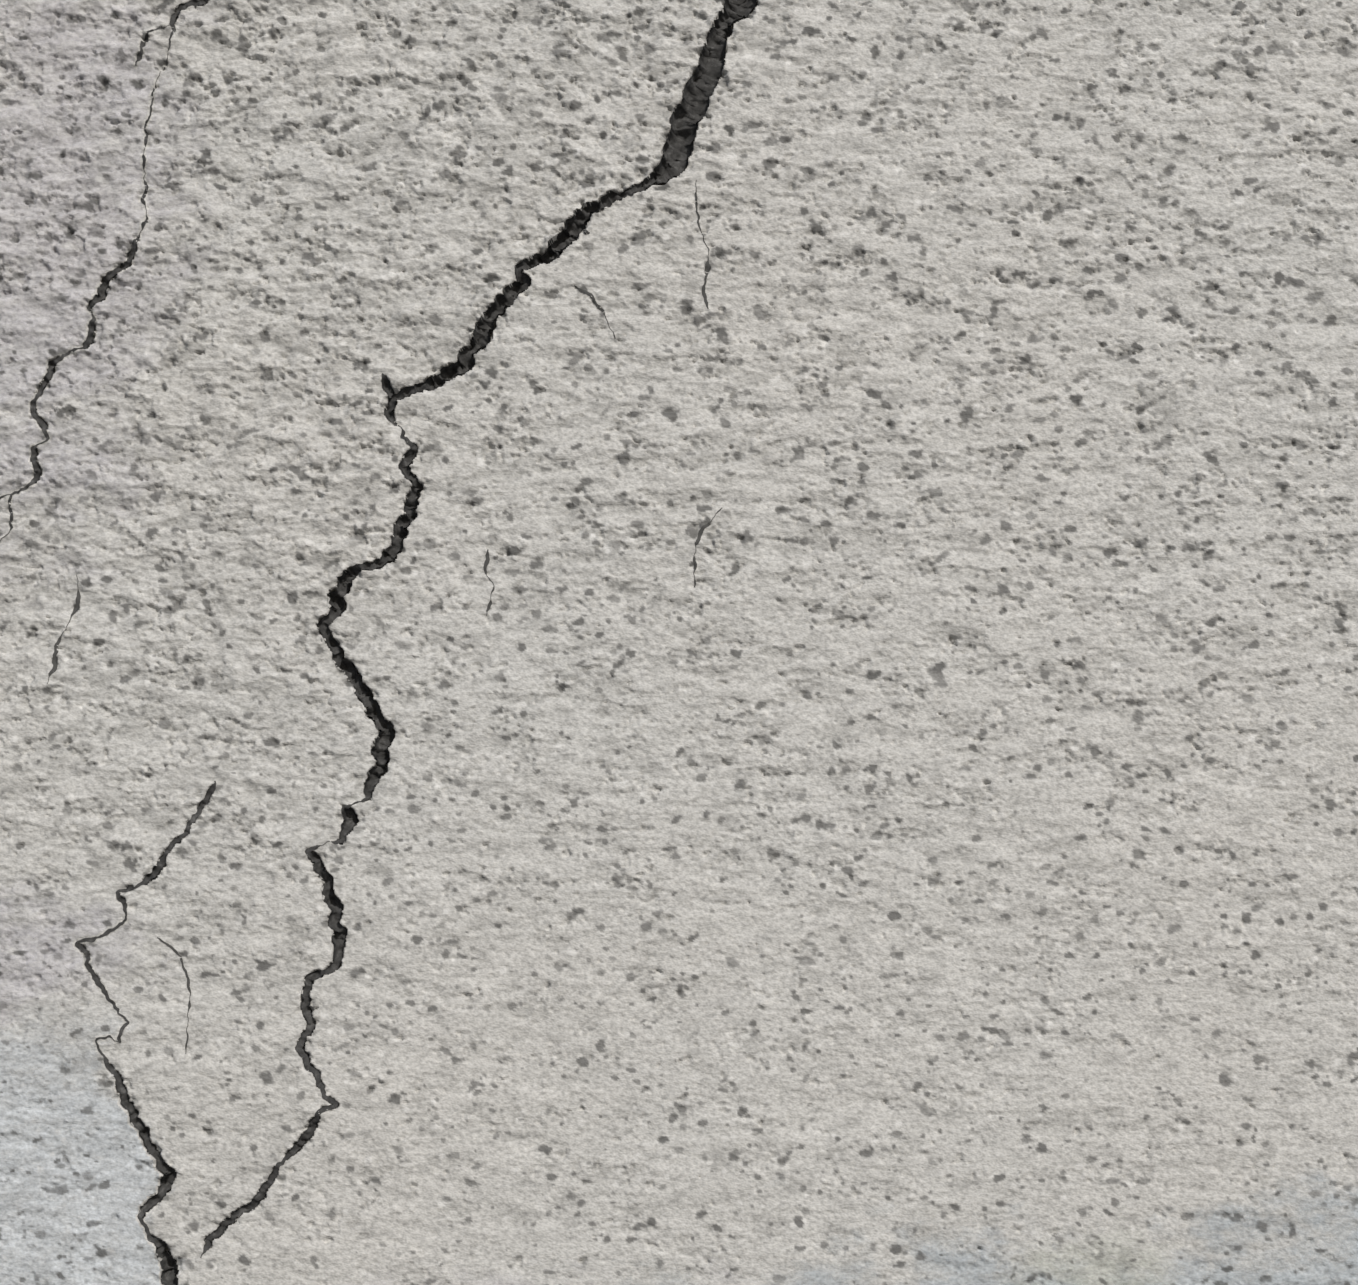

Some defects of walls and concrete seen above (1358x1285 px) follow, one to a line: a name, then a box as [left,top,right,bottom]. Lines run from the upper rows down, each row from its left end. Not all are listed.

crack [0,0,209,541]
crack [75,0,757,1285]